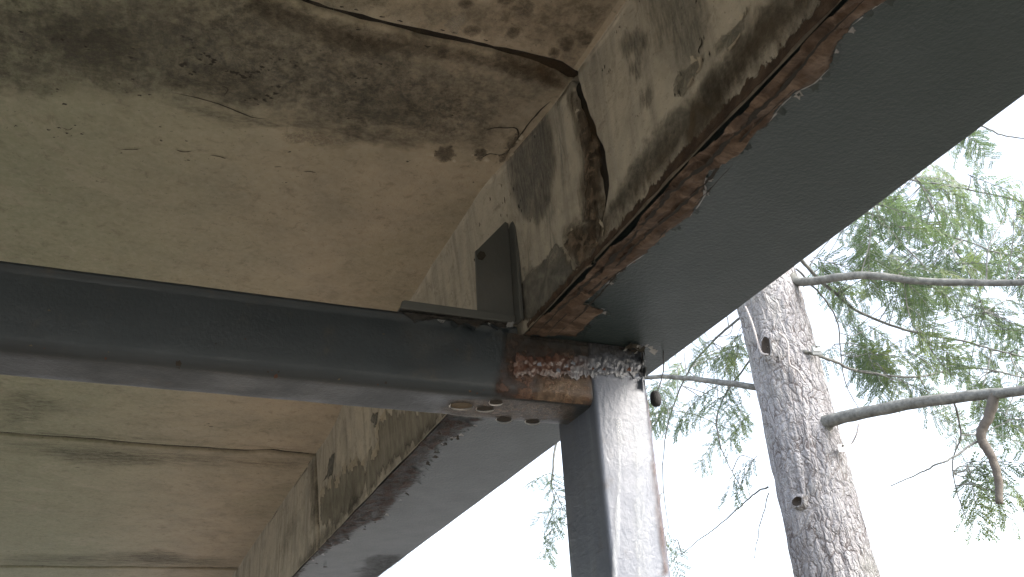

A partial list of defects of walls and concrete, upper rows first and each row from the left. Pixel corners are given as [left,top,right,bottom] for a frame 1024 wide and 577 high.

water stain [0,0,499,141]
crack [291,0,609,207]
peeling [674,6,747,97]
rust [293,0,895,577]